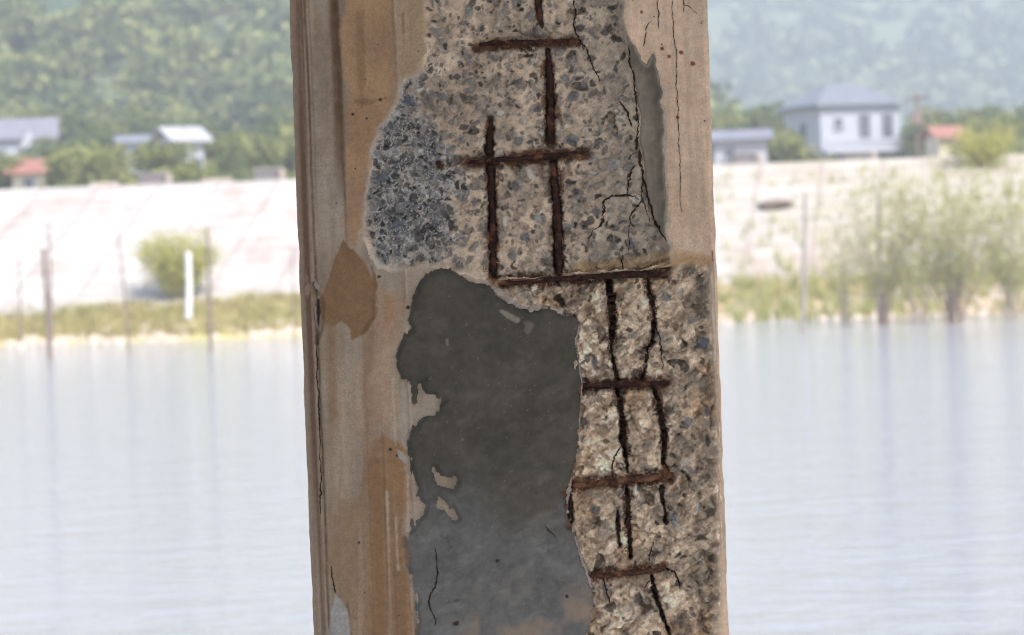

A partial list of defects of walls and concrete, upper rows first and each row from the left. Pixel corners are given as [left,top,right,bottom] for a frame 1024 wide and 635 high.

spalling [362,0,723,635]
rust [432,30,714,586]
crack [573,0,600,81]
crack [588,0,698,635]